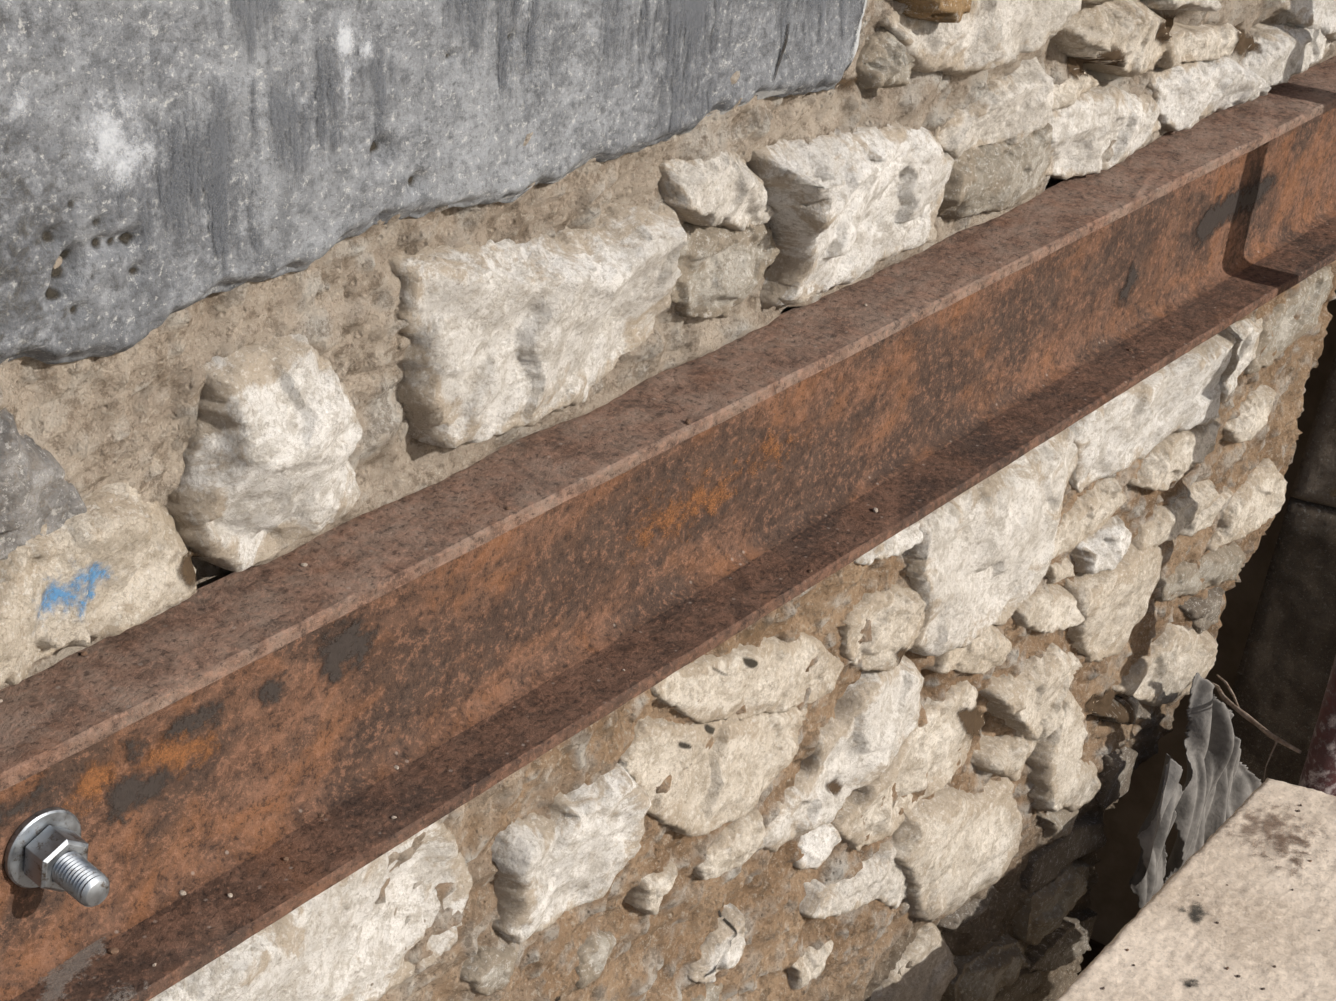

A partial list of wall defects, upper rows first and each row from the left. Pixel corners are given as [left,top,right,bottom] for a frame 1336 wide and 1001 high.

corrosion [641,470,731,546]
corrosion [147,732,214,769]
corrosion [66,767,116,808]